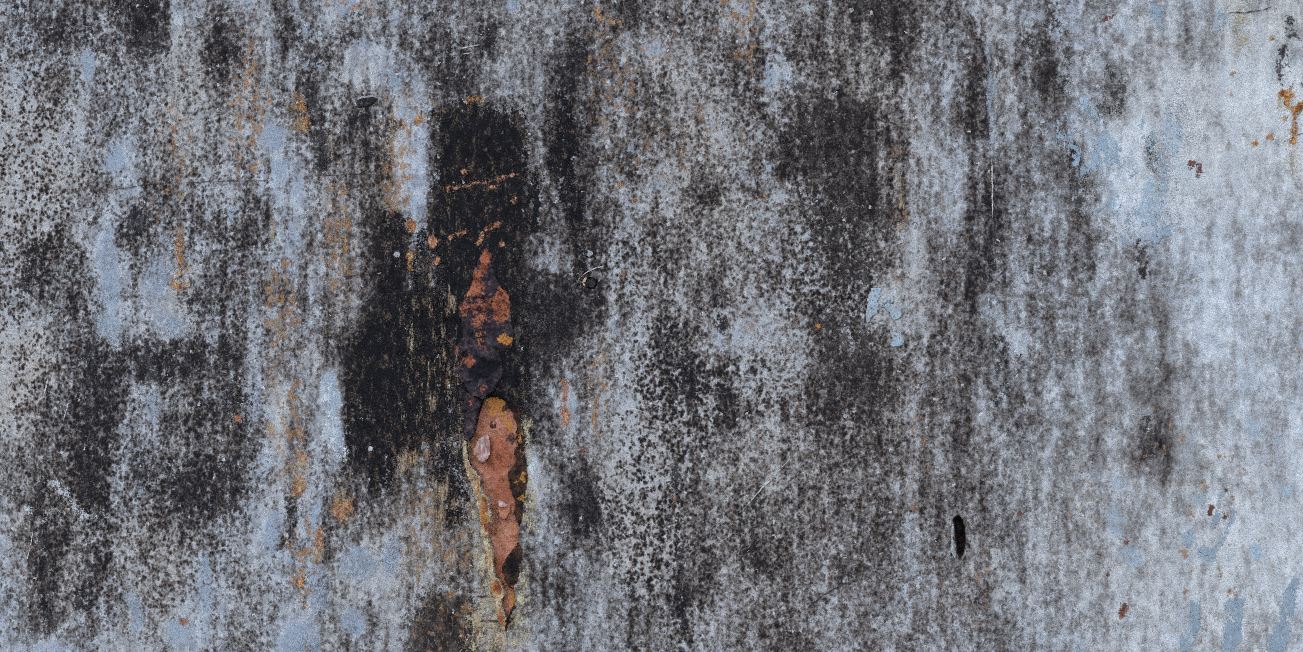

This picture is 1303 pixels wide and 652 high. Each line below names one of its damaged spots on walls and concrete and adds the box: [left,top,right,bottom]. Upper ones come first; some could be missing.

water stain [119,279,265,528]
rust [404,286,459,417]
rust [406,219,505,284]
water stain [345,23,594,529]
rust [447,169,517,192]
water stain [650,312,780,434]
water stain [710,291,729,335]
water stain [769,51,900,429]
rust [1278,83,1303,179]
water stain [24,330,110,636]
rust [518,415,541,533]
rust [398,450,530,652]